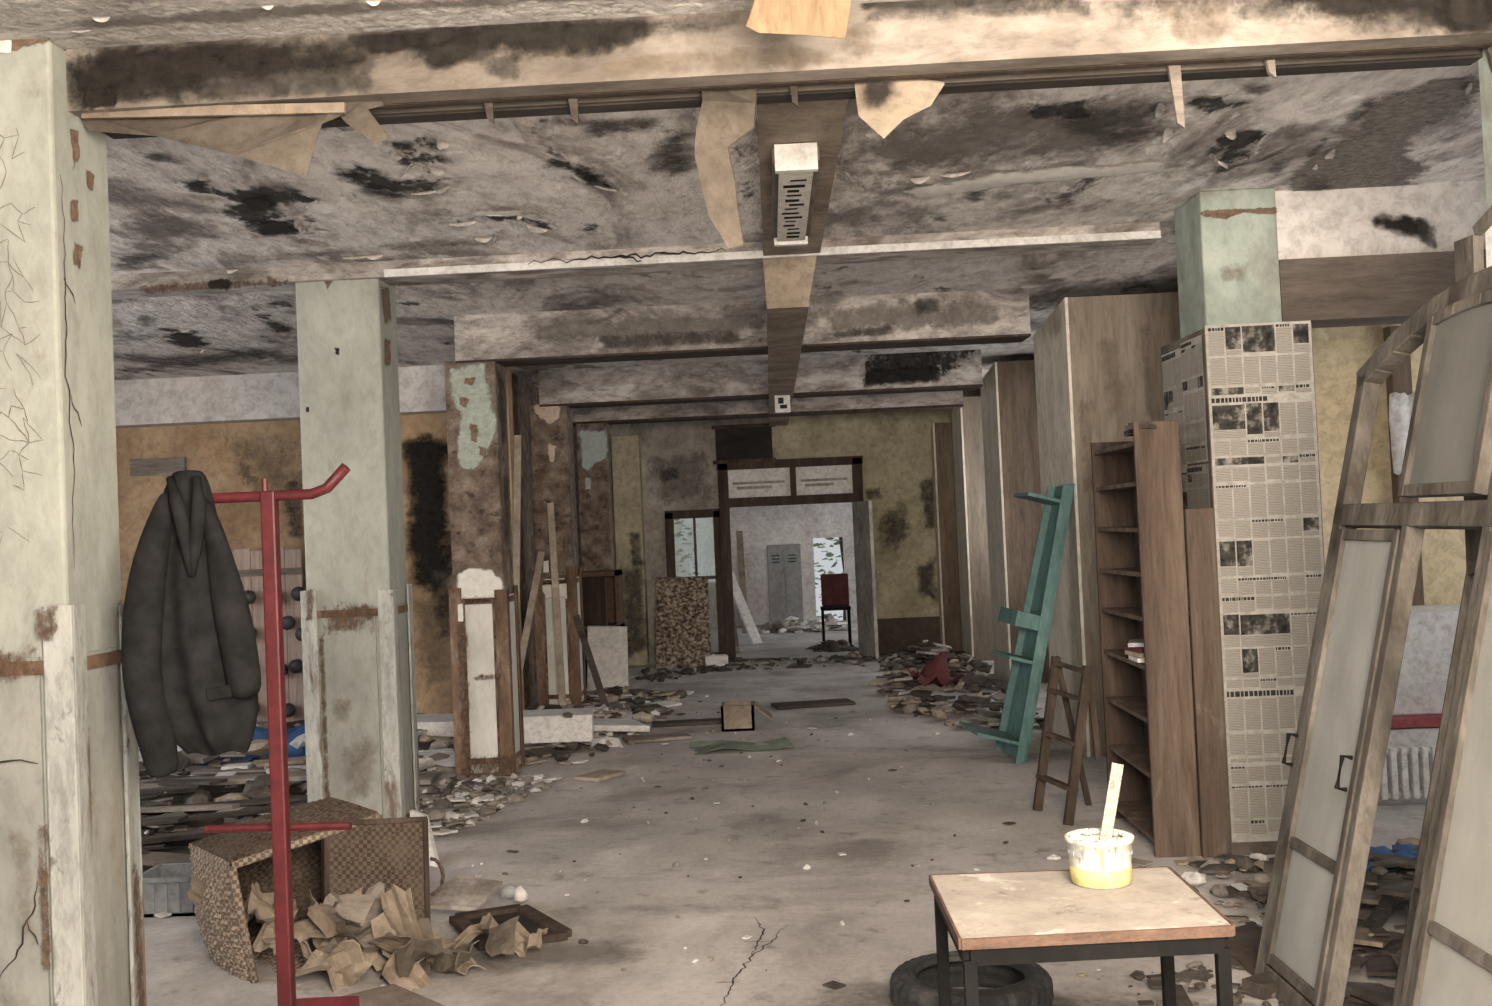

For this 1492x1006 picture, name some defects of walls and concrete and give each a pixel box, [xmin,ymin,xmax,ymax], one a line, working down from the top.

water stain [66,19,699,110]
water stain [862,0,1085,19]
water stain [1130,0,1492,33]
water stain [1373,214,1437,248]
crack [0,128,82,568]
peeling [449,362,497,470]
water stain [403,434,452,671]
corrosion [0,606,58,680]
corrosion [306,589,374,797]
crack [0,757,38,765]
crack [0,881,38,977]
corrosion [39,825,51,971]